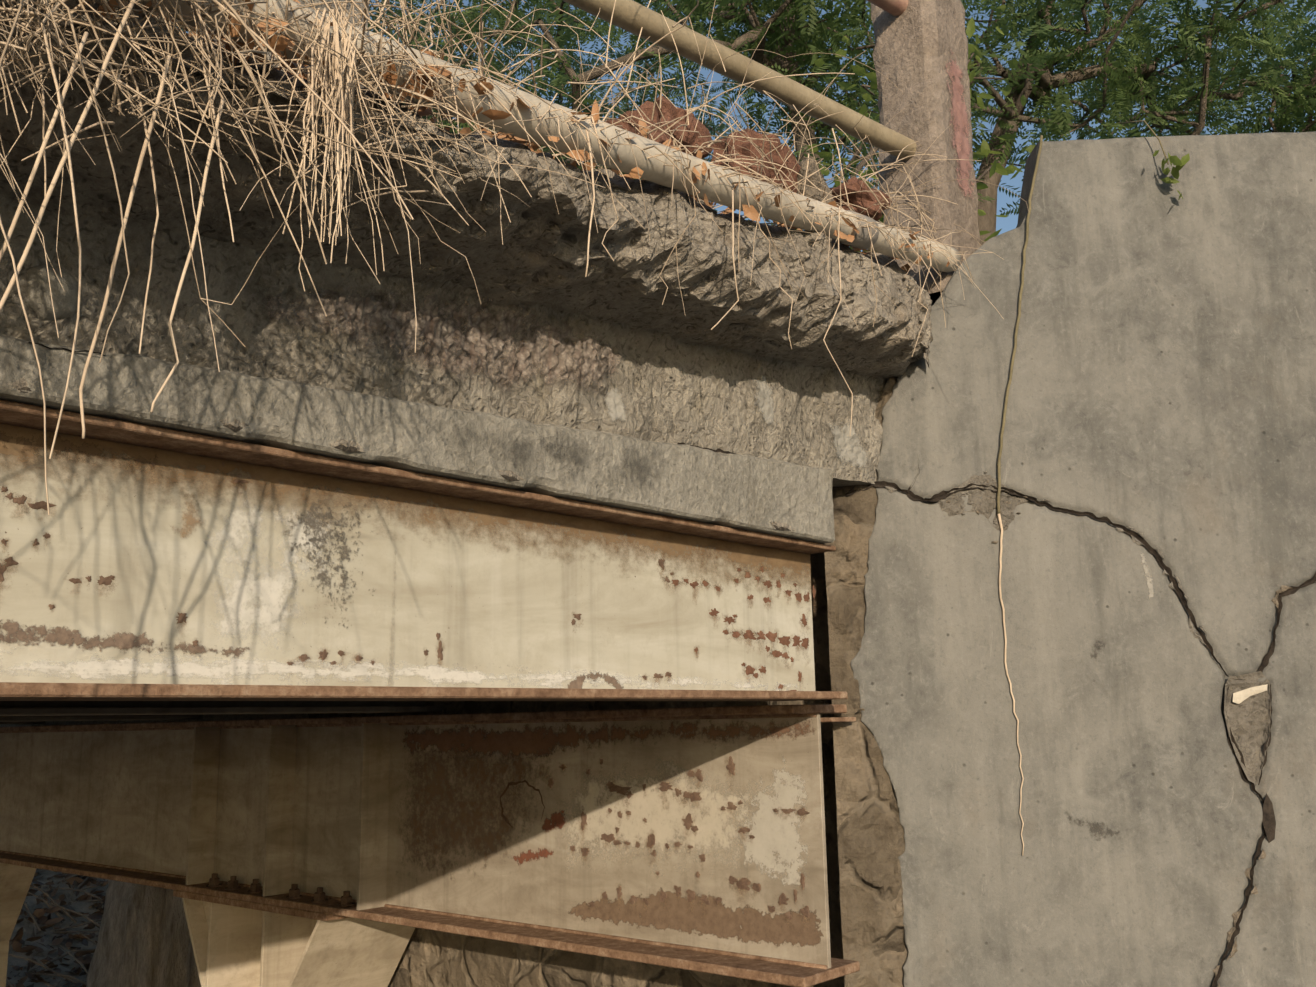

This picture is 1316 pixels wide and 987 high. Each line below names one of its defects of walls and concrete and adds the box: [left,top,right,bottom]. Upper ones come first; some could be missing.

rust [0,423,816,691]
rust [513,848,554,865]
rust [403,720,814,832]
rust [568,769,824,947]
crack [845,459,1316,987]